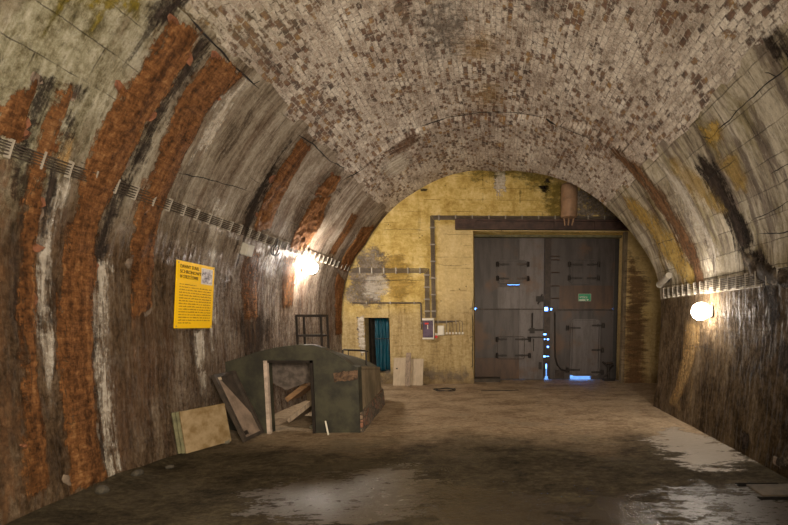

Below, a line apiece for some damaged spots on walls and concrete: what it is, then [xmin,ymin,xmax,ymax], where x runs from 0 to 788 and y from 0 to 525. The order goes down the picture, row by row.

leakage [70,84,88,99]
crack [409,111,603,146]
leakage [762,26,788,64]
leakage [40,112,75,251]
leakage [91,32,210,466]
rust [609,145,705,305]
leakage [659,162,719,260]
leakage [696,156,768,273]
crack [750,201,788,234]